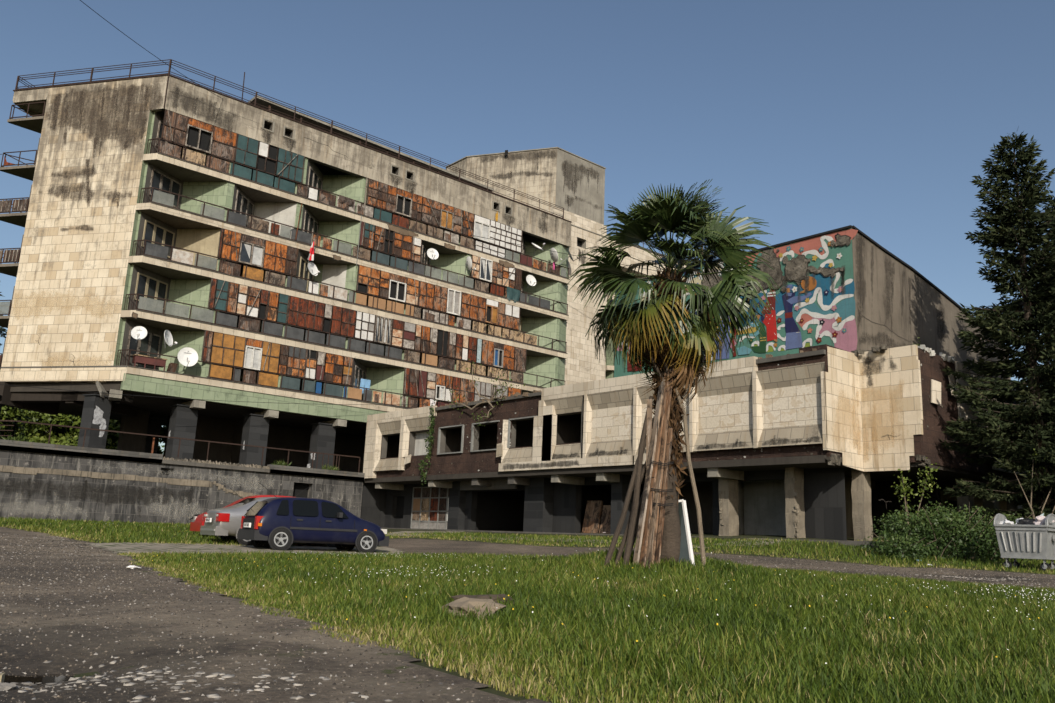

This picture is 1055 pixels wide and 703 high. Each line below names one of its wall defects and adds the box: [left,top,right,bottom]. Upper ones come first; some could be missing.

water stain [48,84,233,204]
water stain [482,151,598,205]
peeling [830,235,851,248]
peeling [745,248,845,305]